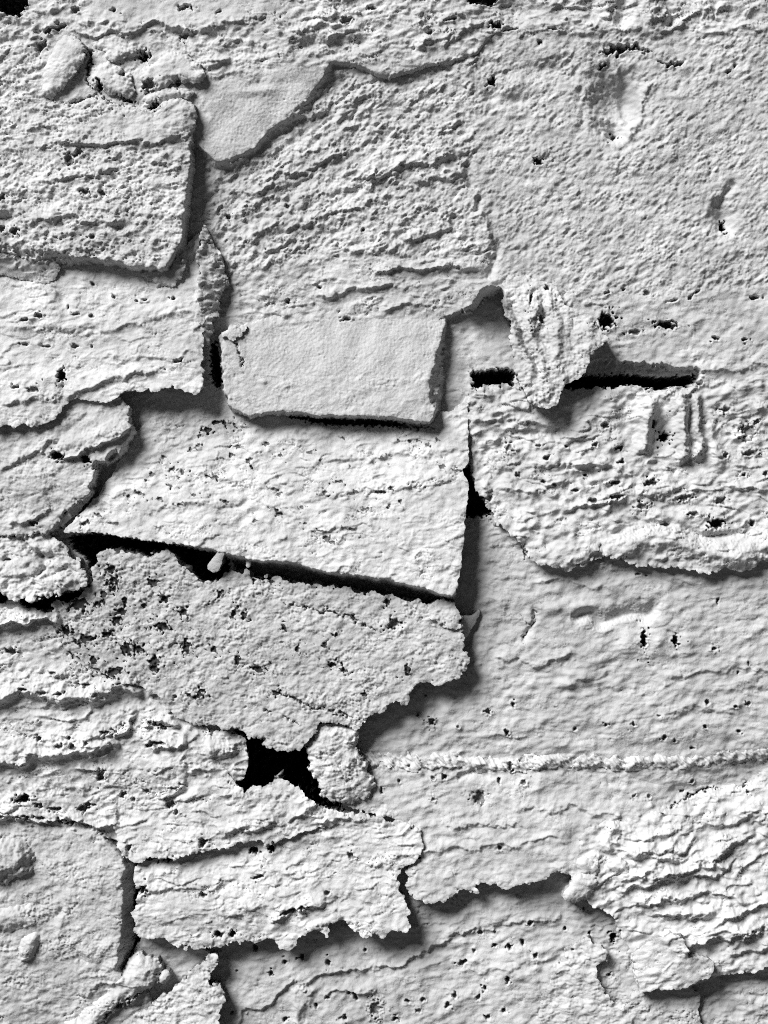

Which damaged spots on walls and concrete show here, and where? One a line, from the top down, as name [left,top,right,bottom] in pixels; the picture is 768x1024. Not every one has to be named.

flaking render [0,0,523,429]
crack [209,340,244,389]
crack [289,416,405,428]
crack [463,465,491,518]
crack [0,532,436,630]
flaking render [0,275,768,1024]